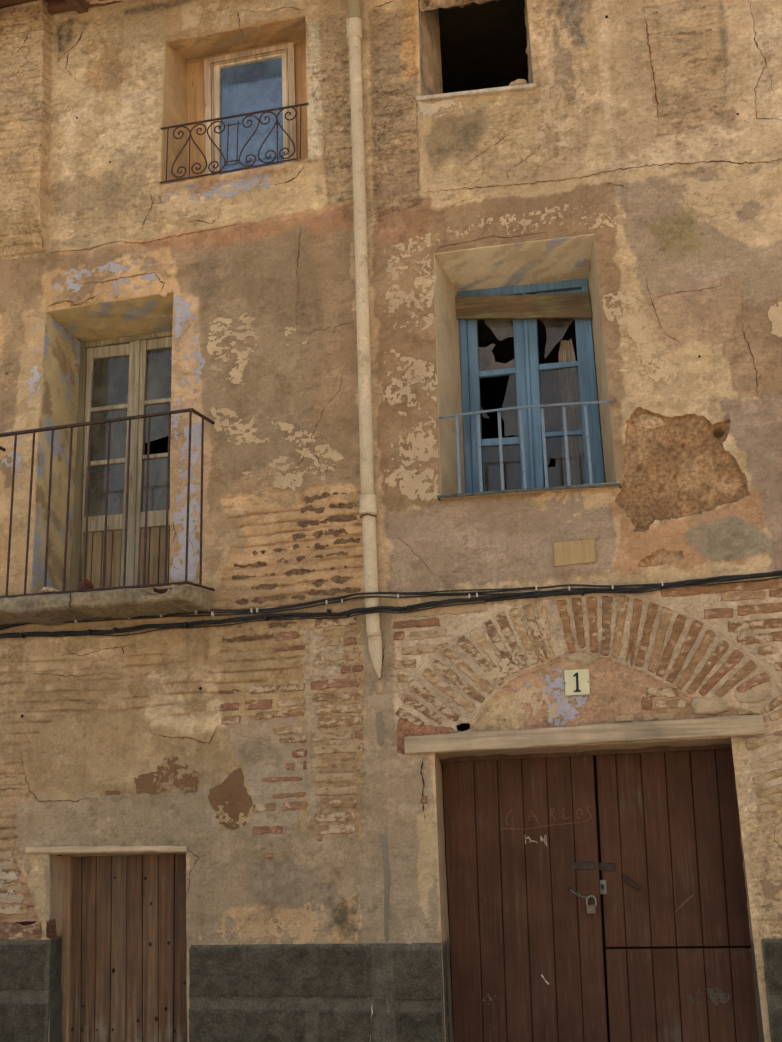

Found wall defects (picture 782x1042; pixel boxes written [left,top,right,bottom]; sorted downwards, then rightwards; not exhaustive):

spalling [419,0,499,12]
crack [407,0,782,210]
crack [37,191,243,307]
peeling [384,204,627,332]
crack [644,270,758,398]
peeling [153,295,361,605]
peeling [383,349,441,501]
spalling [615,407,751,532]
crack [0,743,90,802]
crack [153,722,220,744]
flaking render [134,617,364,841]
peeling [507,669,587,726]